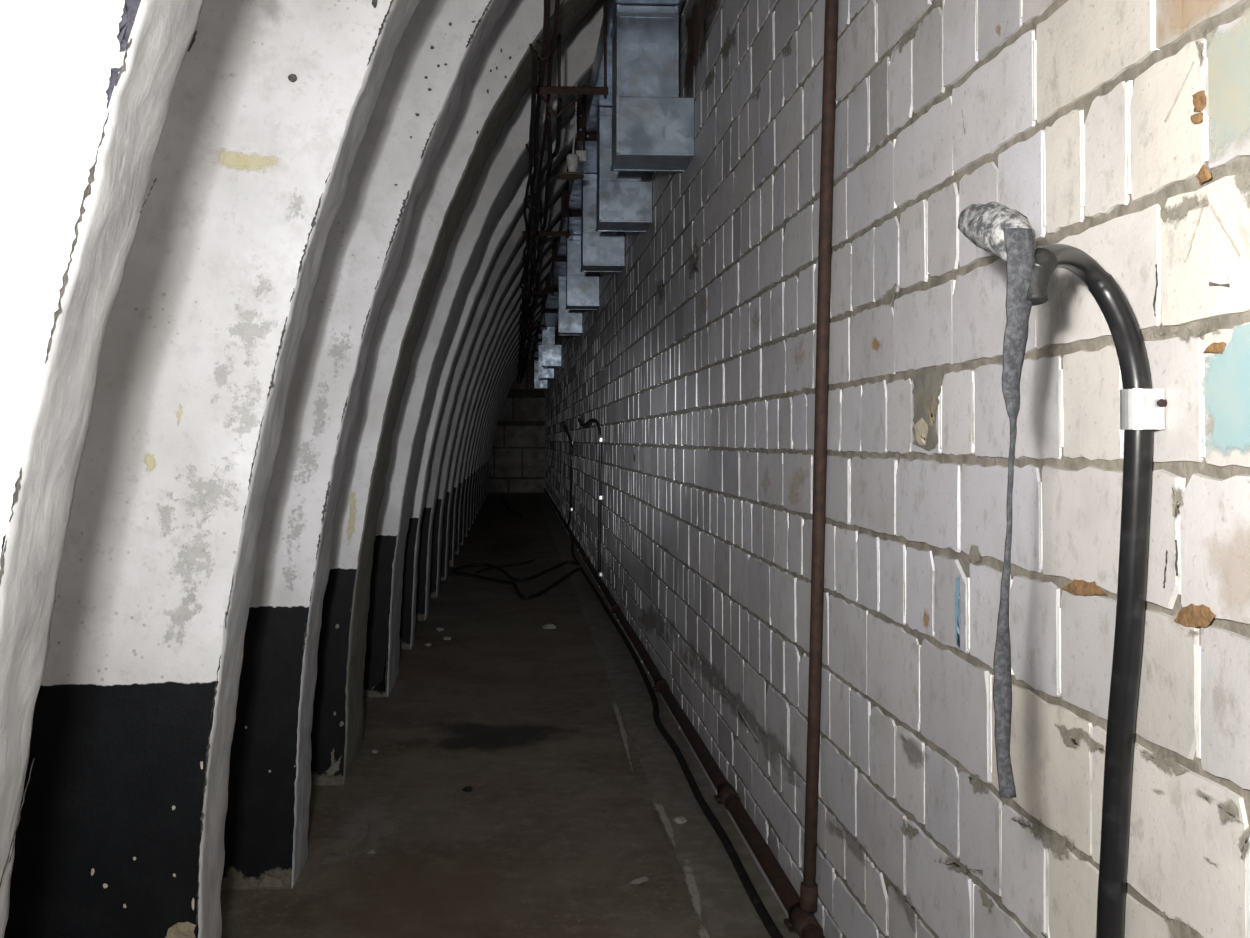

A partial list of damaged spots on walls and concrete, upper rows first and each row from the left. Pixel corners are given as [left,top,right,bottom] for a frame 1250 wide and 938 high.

peeling [116,0,141,52]
peeling [106,68,119,108]
peeling [1191,90,1206,124]
peeling [1203,342,1226,354]
spalling [912,371,944,451]
peeling [1061,579,1106,596]
peeling [1174,603,1216,627]
damp [440,724,556,749]
spalling [165,897,196,938]